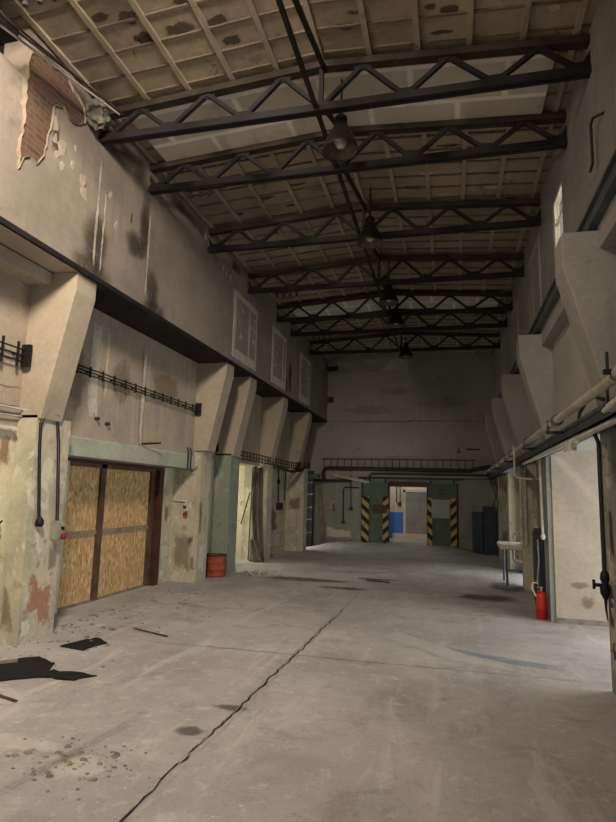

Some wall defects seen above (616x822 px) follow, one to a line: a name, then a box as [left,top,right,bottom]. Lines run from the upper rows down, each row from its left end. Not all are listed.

spalling [16,46,87,202]
peeling [18,530,52,638]
crack [116,588,573,822]